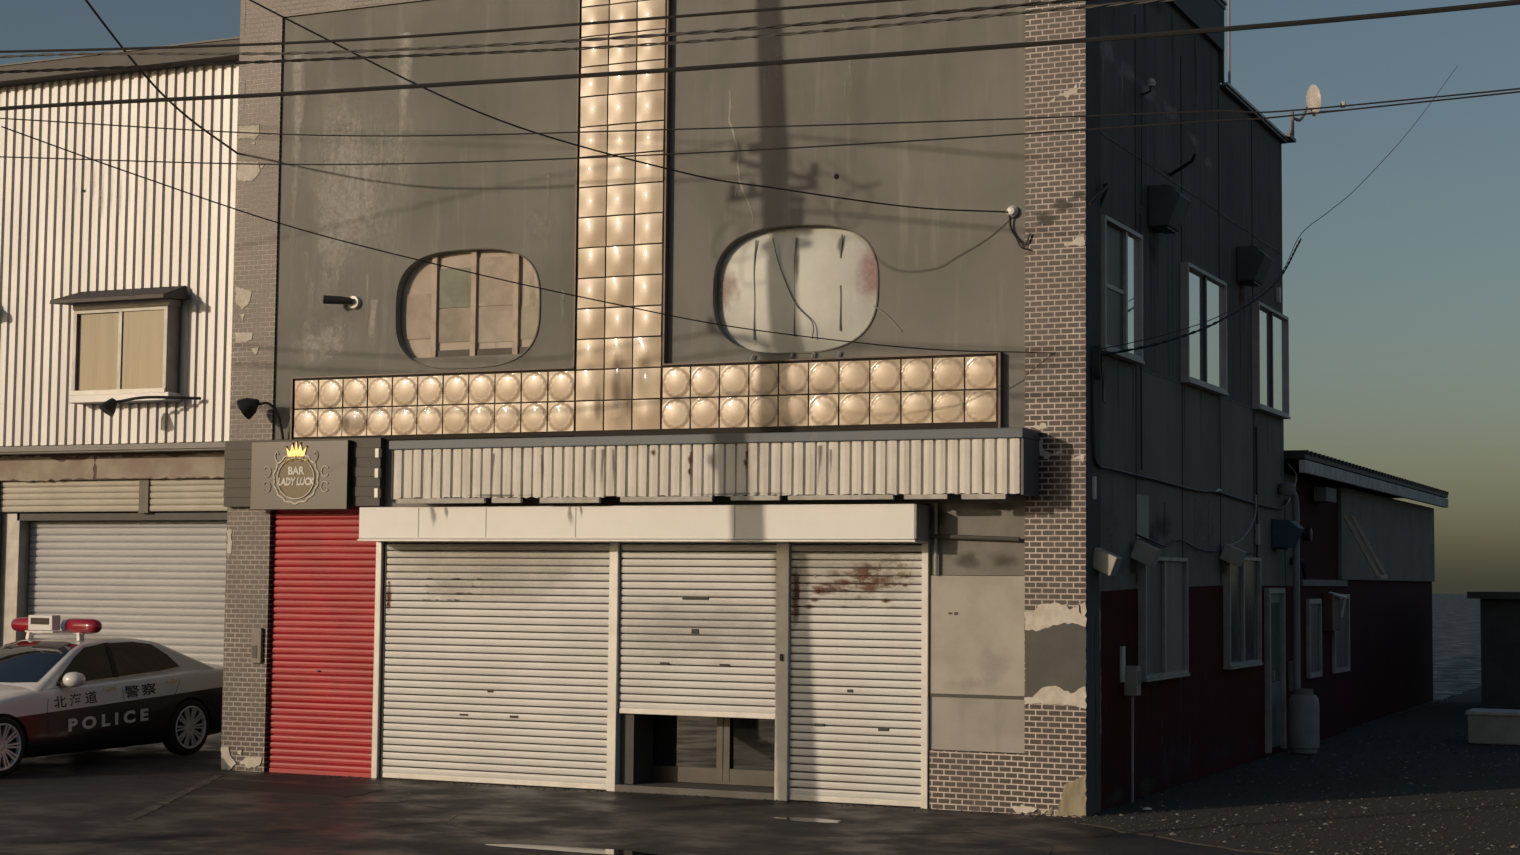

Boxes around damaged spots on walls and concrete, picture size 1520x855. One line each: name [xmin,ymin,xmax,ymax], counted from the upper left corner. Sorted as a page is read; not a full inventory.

spalling [237,124,264,182]
damp [293,54,304,189]
damp [317,32,411,269]
spalling [235,286,259,354]
rust [793,565,908,618]
spalling [1024,571,1101,651]